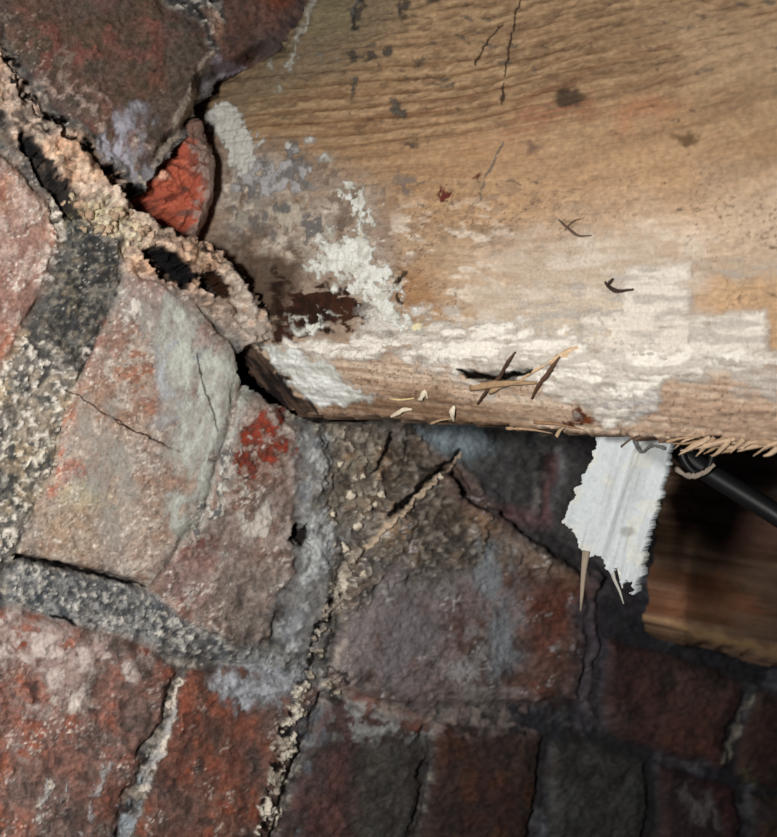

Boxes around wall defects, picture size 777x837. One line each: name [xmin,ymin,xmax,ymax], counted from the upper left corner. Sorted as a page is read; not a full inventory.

damp [194,50,215,75]
damp [284,0,317,71]
crack [0,47,145,202]
damp [155,83,200,161]
crack [153,219,265,310]
damp [204,101,777,429]
crack [197,356,218,431]
crack [369,431,392,473]
crack [387,448,460,517]
peeling [562,436,676,611]
crack [11,553,146,588]
crack [50,615,77,626]